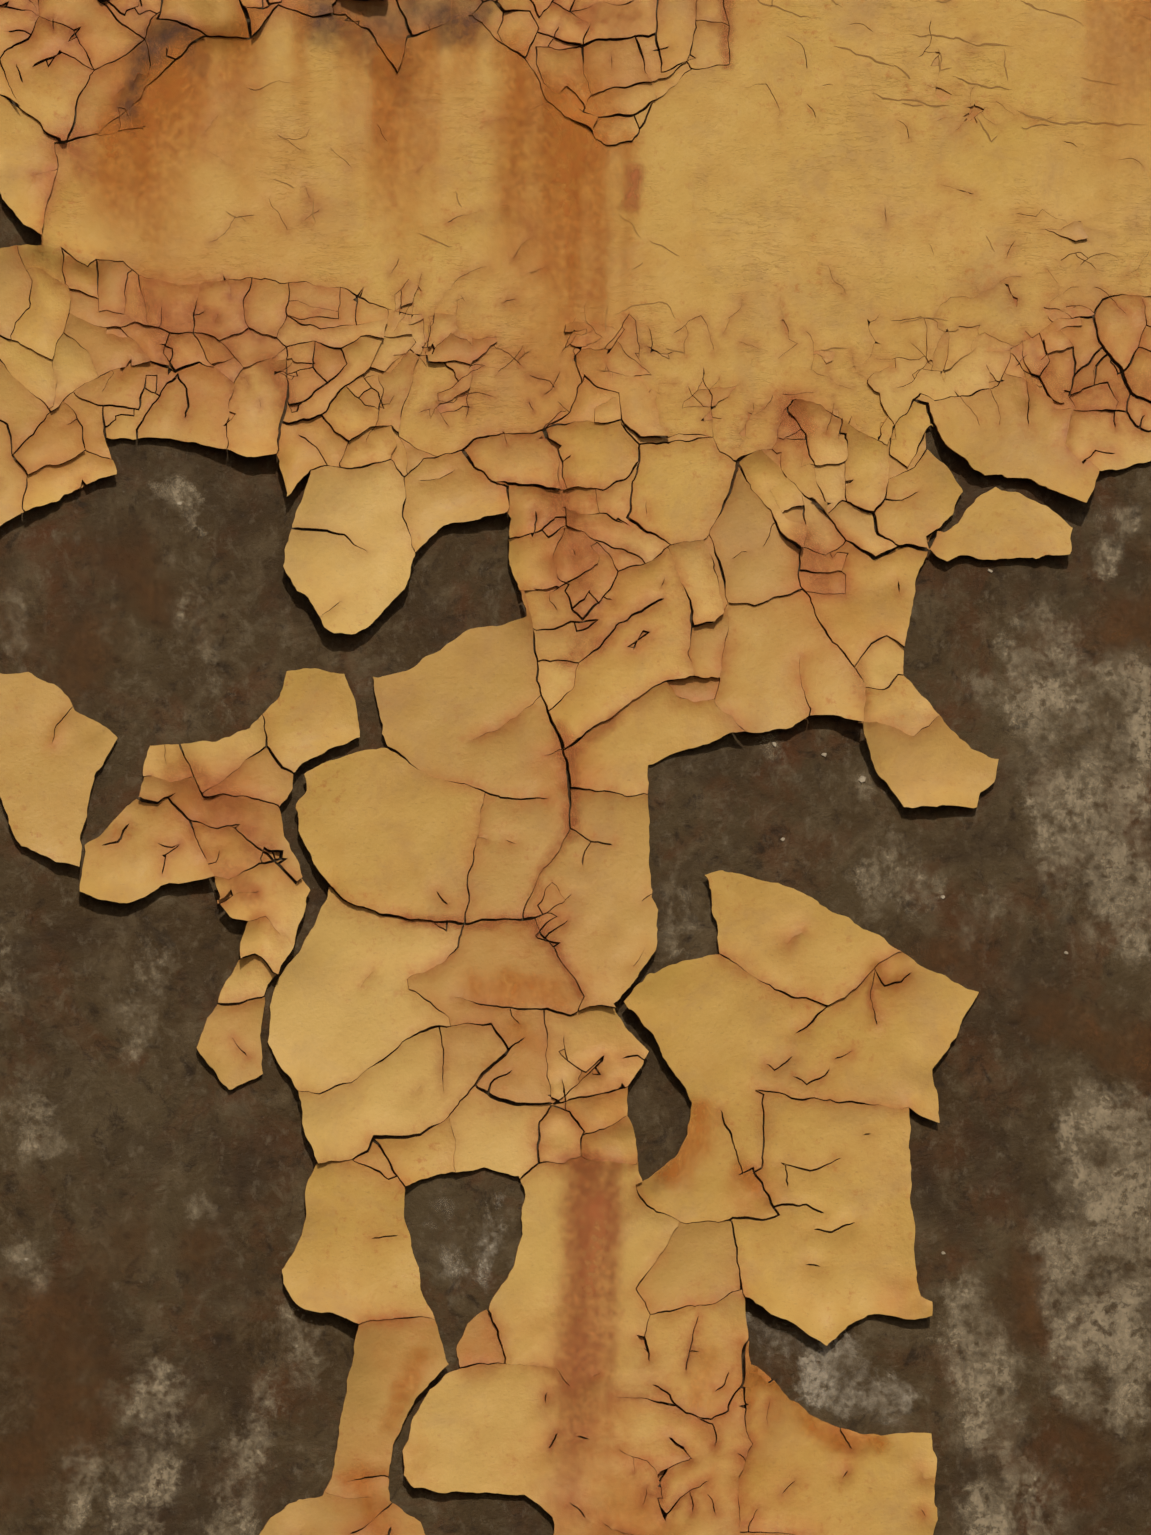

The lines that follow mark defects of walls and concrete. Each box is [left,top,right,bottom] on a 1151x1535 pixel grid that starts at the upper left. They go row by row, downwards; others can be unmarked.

crack [758,0,843,17]
crack [835,0,1140,142]
rust [552,81,604,269]
crack [605,216,684,353]
peeling [0,245,1151,808]
peeling [0,672,117,867]
peeling [79,668,360,1090]
leakage [1003,627,1080,739]
leakage [1026,653,1151,957]
peeling [259,591,979,1535]
leakage [1033,1089,1151,1423]
leakage [946,1280,1014,1446]